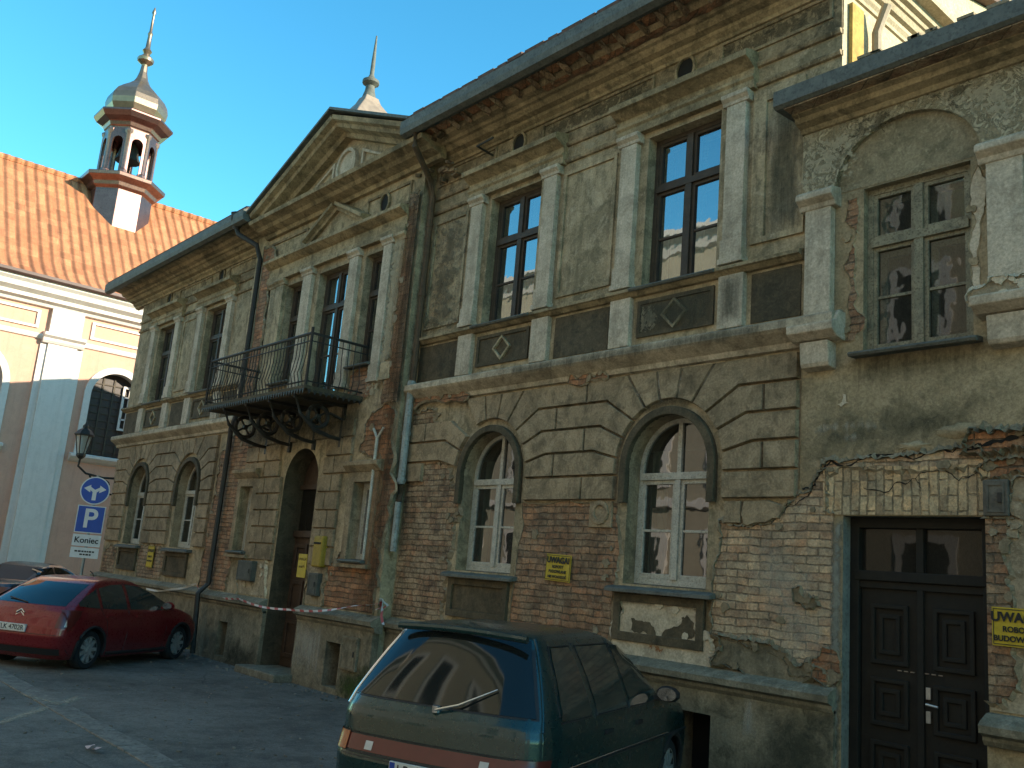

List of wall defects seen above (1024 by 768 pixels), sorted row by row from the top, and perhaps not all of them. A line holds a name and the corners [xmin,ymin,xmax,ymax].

peeling [843,197,867,343]
peeling [965,165,1024,292]
flaking render [303,190,471,621]
crack [782,435,1024,516]
flaking render [609,420,1024,715]